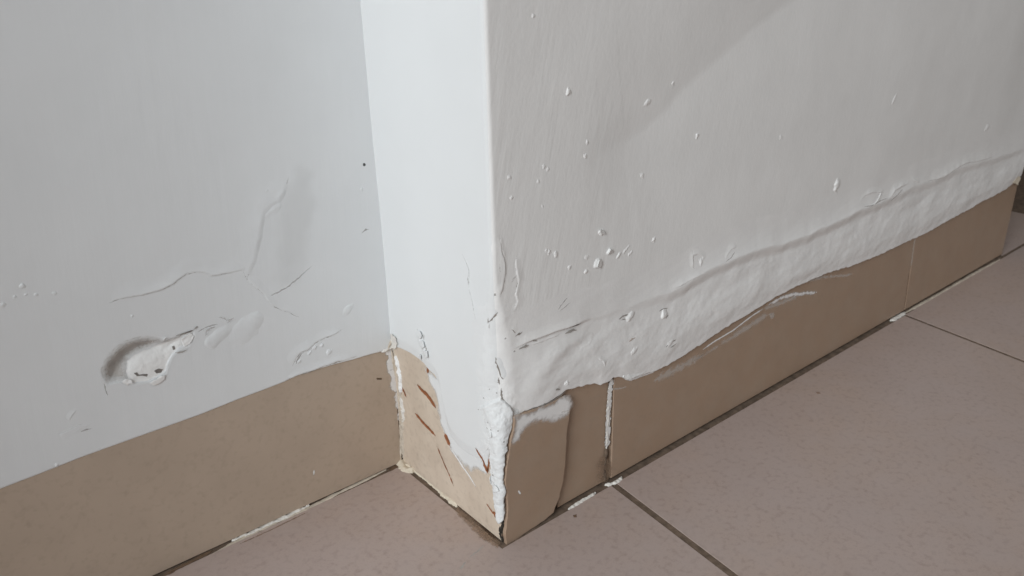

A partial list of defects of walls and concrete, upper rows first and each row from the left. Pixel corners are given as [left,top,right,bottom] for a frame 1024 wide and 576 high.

flaking render [96,326,199,389]
spalling [471,235,572,544]
rust [415,413,453,484]